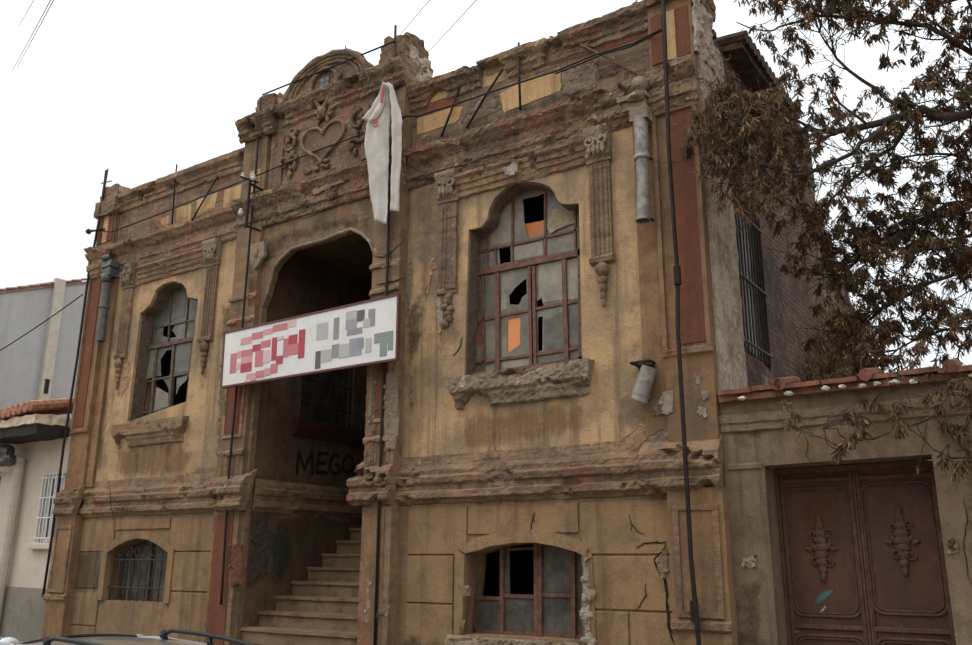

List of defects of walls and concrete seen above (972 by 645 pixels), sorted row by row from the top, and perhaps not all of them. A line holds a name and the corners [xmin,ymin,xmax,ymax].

crack [629,515,674,643]
crack [963,496,972,584]